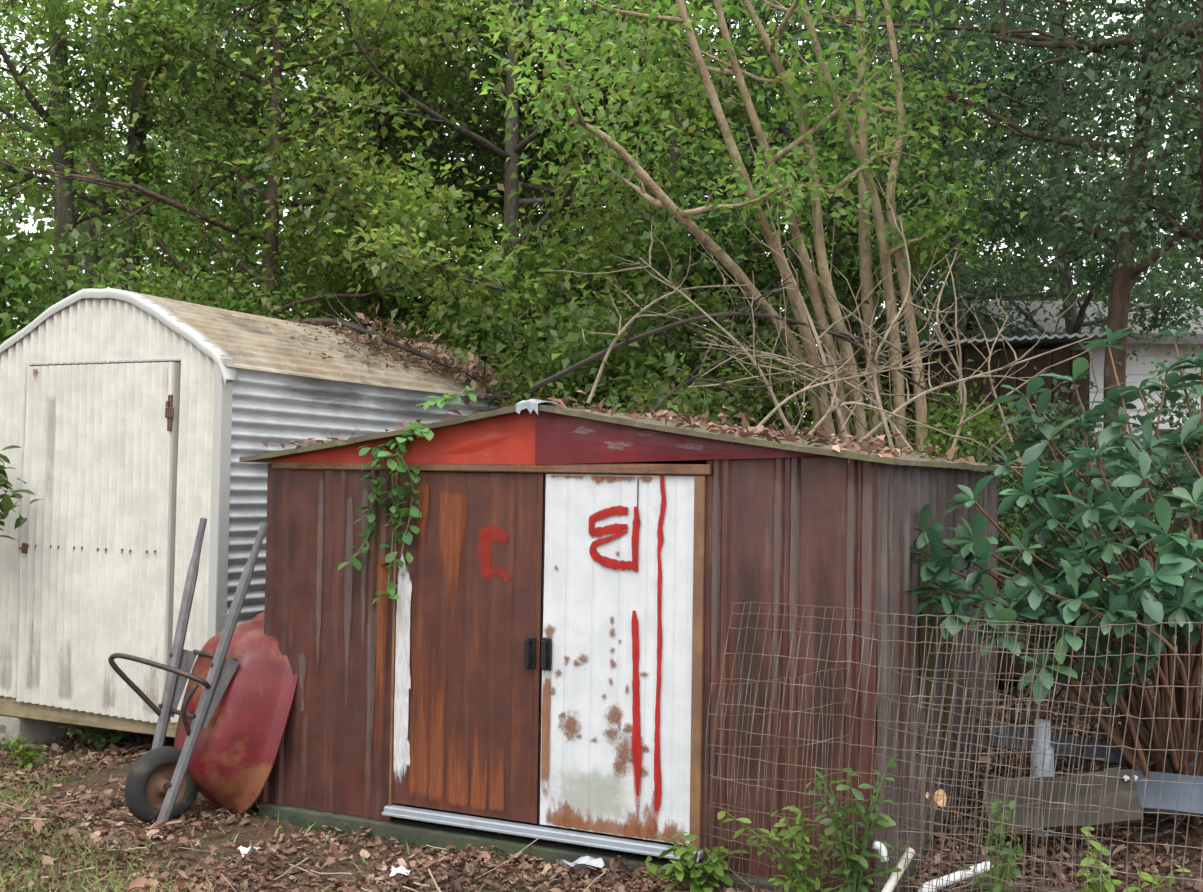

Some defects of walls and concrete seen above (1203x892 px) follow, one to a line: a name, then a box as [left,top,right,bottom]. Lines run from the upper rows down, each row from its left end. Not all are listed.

rust [416,484,465,586]
rust [409,681,504,810]
rust [541,617,649,793]
rust [546,802,686,844]